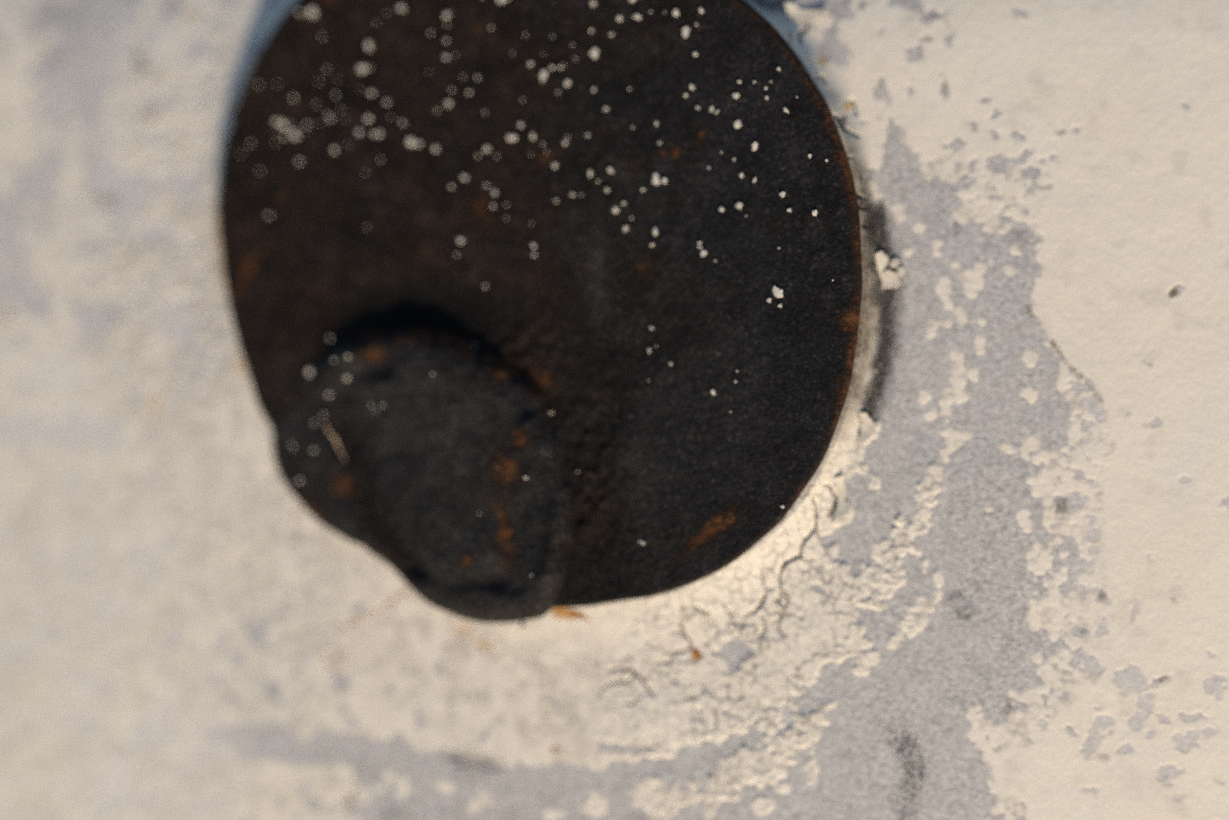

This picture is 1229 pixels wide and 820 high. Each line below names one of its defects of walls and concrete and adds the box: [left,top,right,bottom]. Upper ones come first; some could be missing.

peeling [609,0,703,38]
peeling [757,0,865,65]
peeling [887,0,954,60]
peeling [528,44,598,93]
peeling [158,76,1216,820]
rust [553,608,591,622]
crack [600,485,837,705]